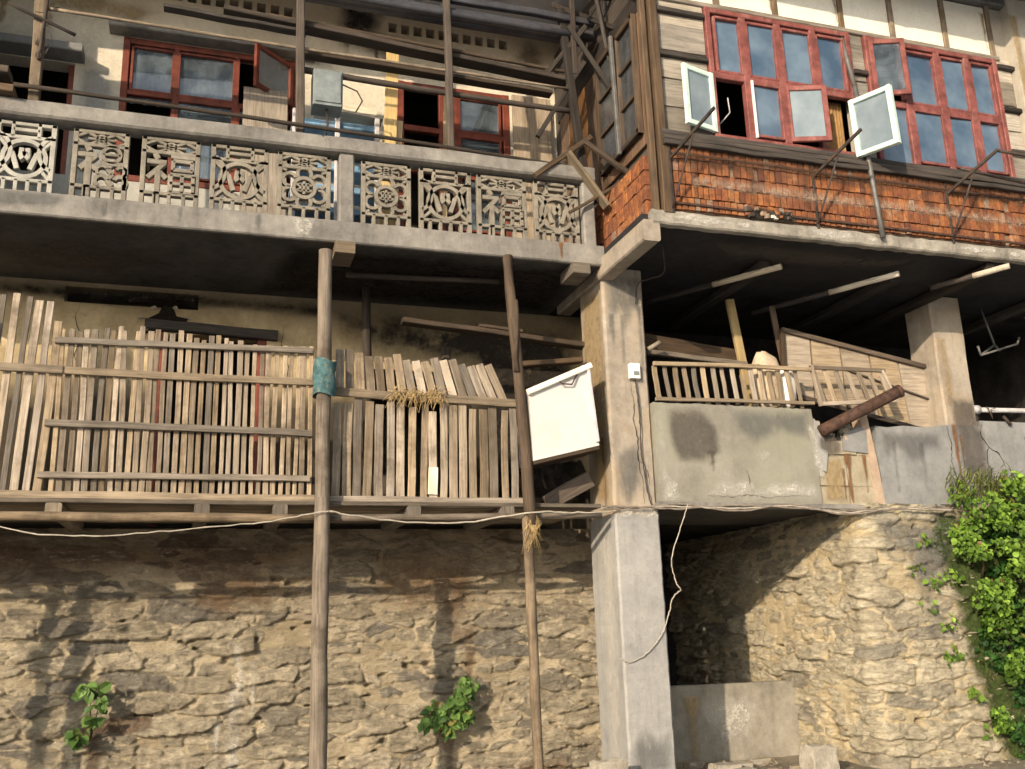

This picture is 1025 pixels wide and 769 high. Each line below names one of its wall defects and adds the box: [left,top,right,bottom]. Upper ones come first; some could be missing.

water stain [672,414,716,463]
spalling [809,419,868,475]
rust [952,424,963,467]
rust [842,454,867,502]